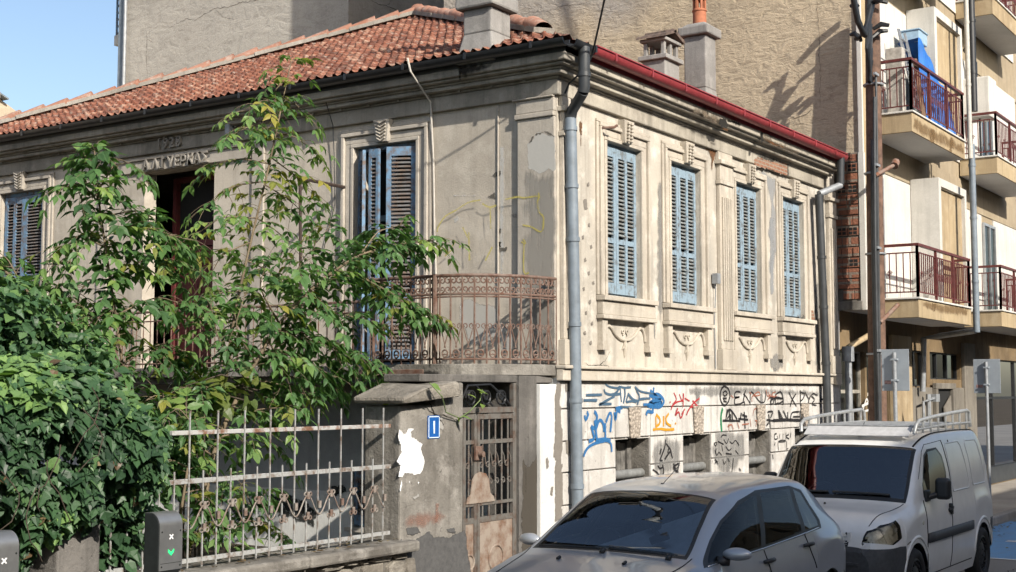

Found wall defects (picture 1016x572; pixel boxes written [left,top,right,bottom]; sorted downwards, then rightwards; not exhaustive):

crack [145,0,256,73]
peeling [524,131,557,363]
peeling [397,428,425,500]